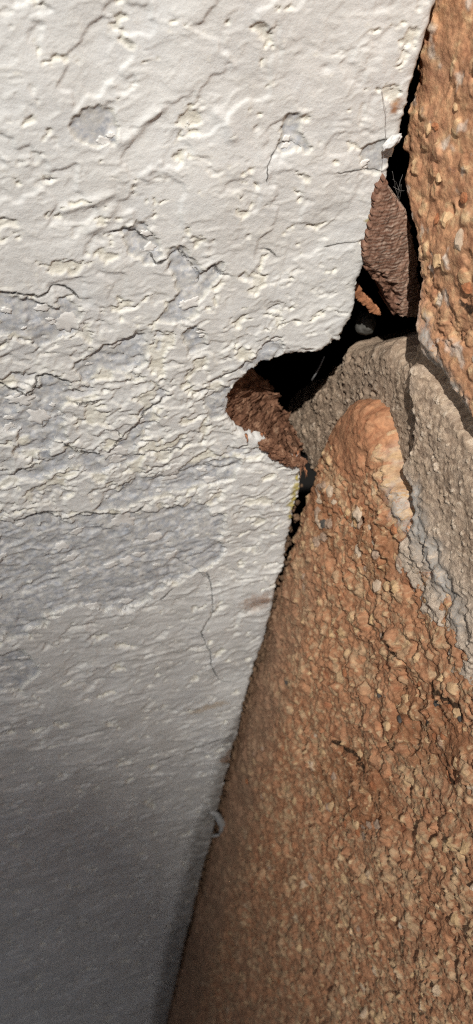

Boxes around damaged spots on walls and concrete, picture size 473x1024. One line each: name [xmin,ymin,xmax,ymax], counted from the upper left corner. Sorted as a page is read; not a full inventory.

peeling [278,113,308,151]
crack [113,228,223,280]
crack [11,284,79,298]
peeling [122,224,223,350]
peeling [244,337,281,370]
crack [0,373,60,395]
peeling [205,389,229,418]
spalling [312,481,337,547]
spalling [346,506,397,592]
crack [177,558,225,682]
spalling [326,801,381,841]